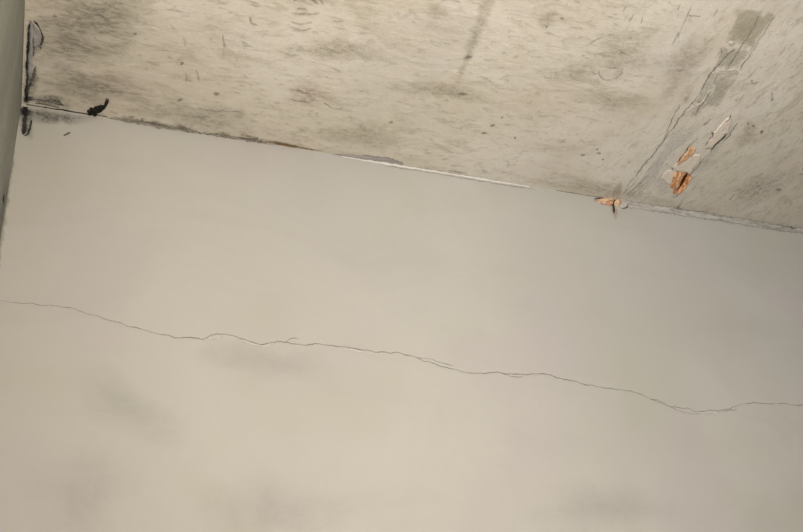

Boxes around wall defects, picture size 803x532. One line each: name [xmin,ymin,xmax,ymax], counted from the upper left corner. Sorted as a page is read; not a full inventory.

crack [625,49,747,197]
spalling [658,115,754,197]